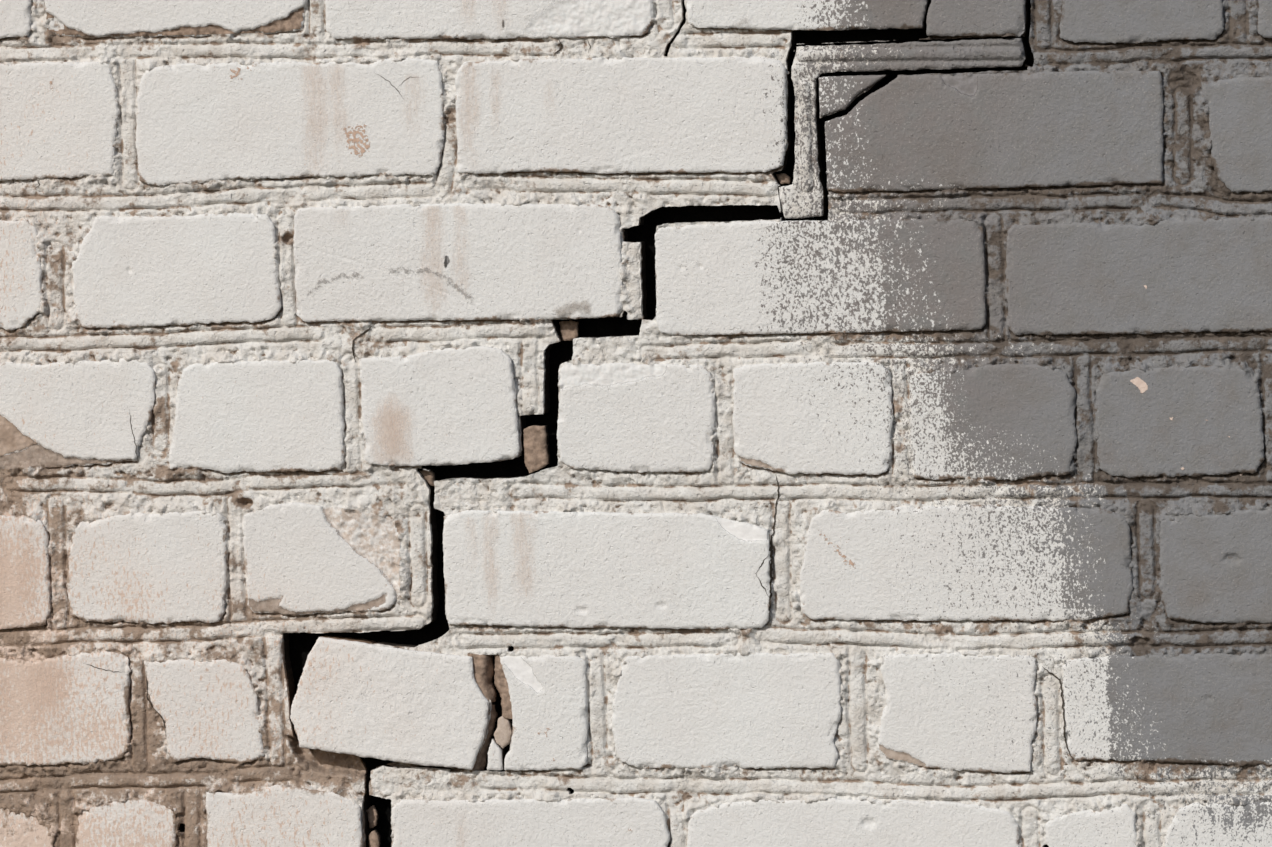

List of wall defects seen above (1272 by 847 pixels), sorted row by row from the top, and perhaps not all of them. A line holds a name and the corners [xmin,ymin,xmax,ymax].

crack [289,0,1034,694]
spalling [0,415,132,469]
spalling [248,507,401,614]
crack [485,655,513,770]
crack [363,758,395,847]